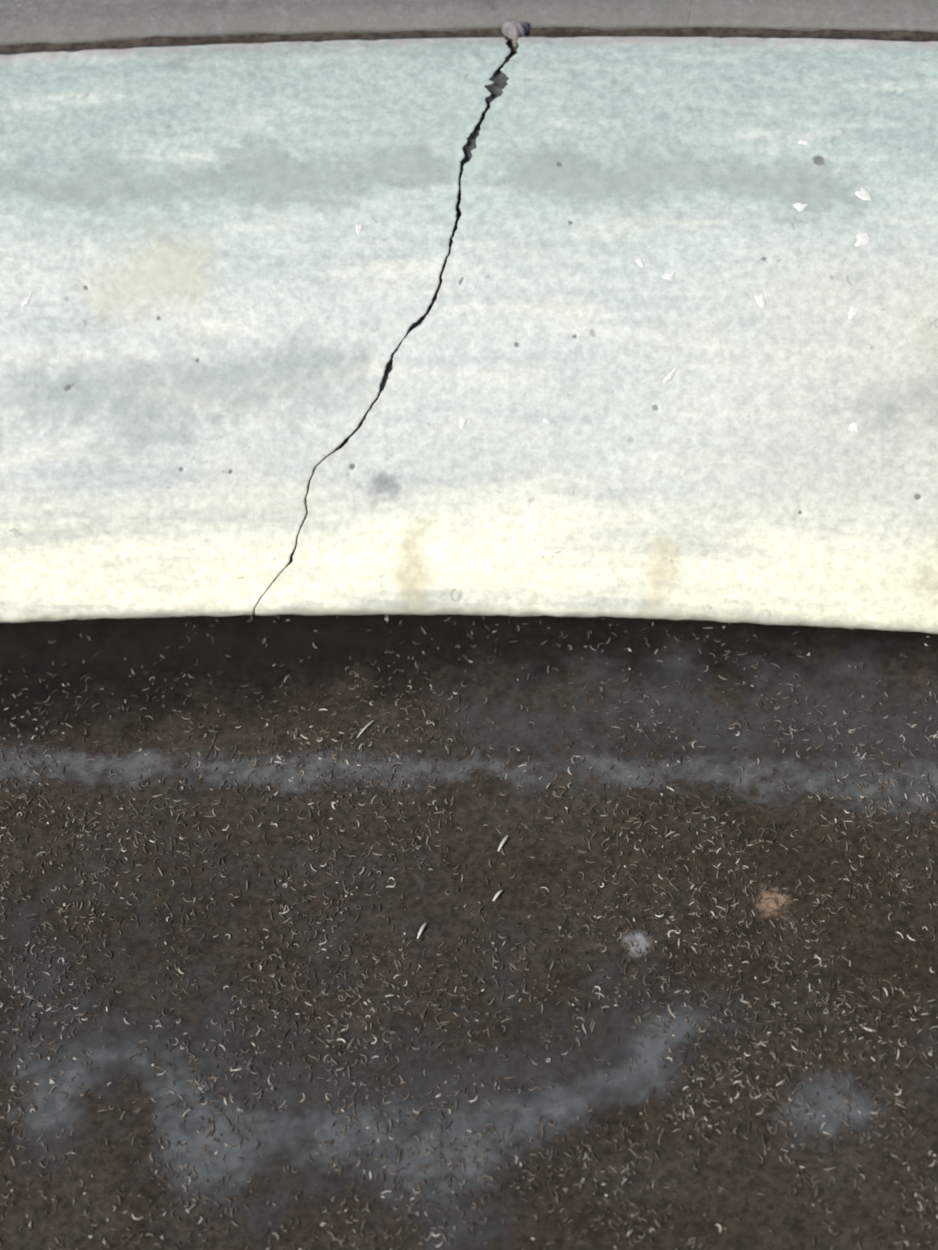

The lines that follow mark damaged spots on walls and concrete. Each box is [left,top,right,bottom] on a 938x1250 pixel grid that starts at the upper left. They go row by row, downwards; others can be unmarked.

crack [254,38,519,610]
water stain [0,610,938,729]
water stain [0,747,938,813]